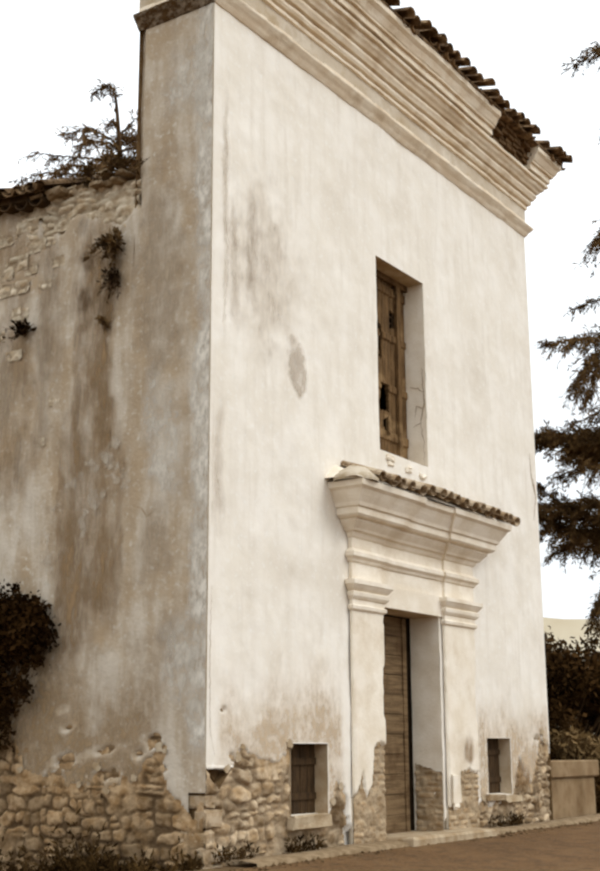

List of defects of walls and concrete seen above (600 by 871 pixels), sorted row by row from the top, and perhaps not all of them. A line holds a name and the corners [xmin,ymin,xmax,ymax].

flaking render [0,202,71,299]
flaking render [0,331,22,362]
flaking render [12,307,29,321]
damp [55,280,120,652]
flaking render [41,744,119,818]
flaking render [137,733,163,755]
flaking render [180,744,253,870]
flaking render [353,742,387,844]
flaking render [414,763,501,831]